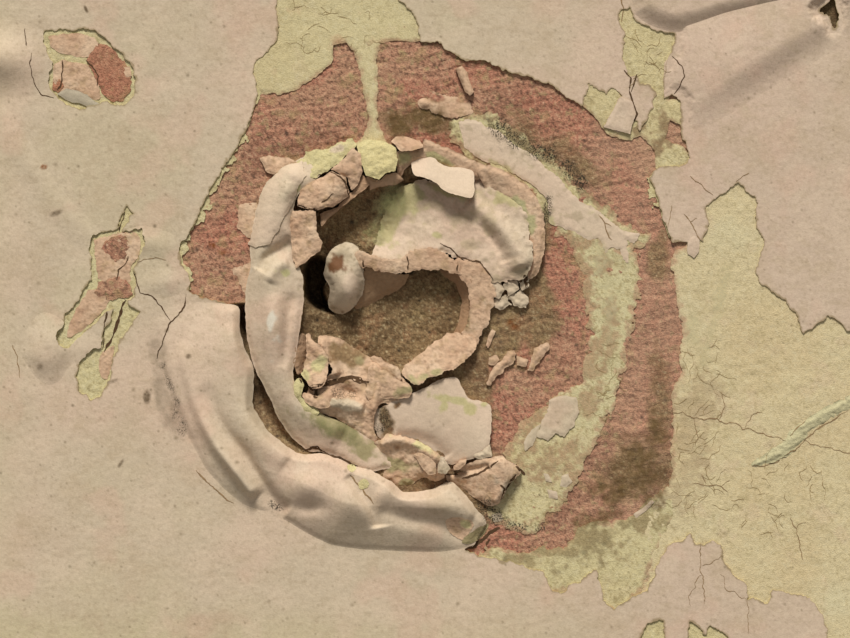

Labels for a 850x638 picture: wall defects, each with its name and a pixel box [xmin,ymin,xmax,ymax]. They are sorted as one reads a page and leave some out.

peeling [43,28,136,109]
peeling [57,206,145,400]
crack [102,257,186,358]
peeling [179,0,850,638]
crack [660,340,847,560]